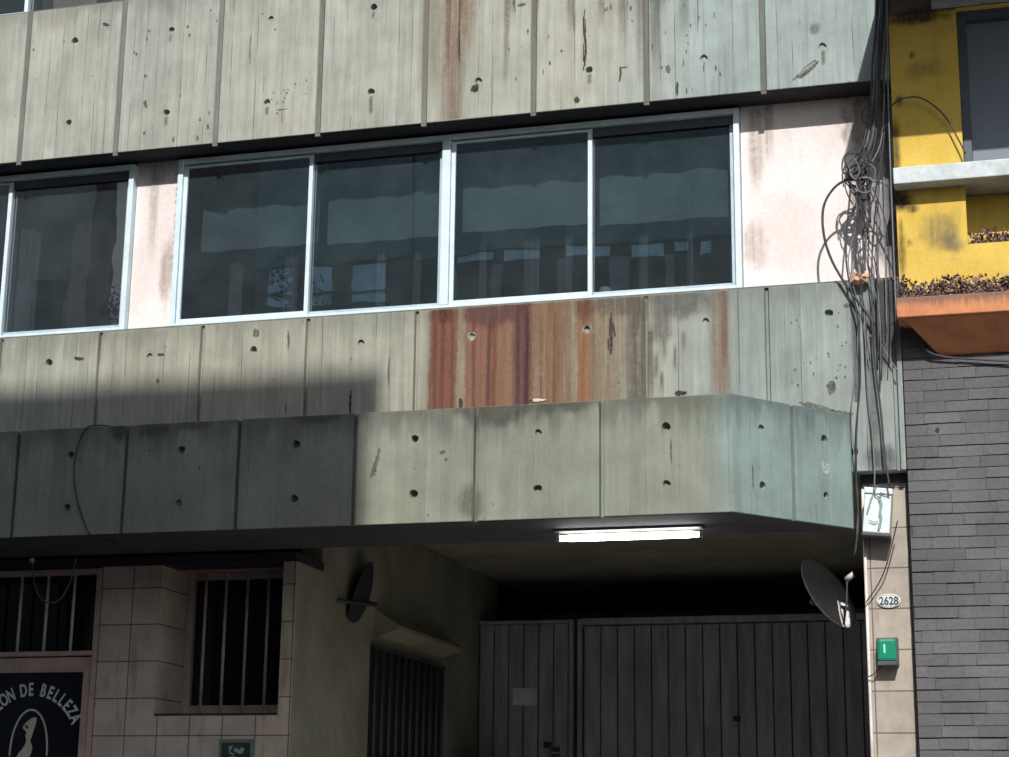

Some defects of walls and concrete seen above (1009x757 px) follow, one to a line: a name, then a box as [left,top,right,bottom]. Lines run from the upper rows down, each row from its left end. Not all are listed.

rust [446,0,473,119]
rust [429,297,641,409]
rust [713,290,727,393]